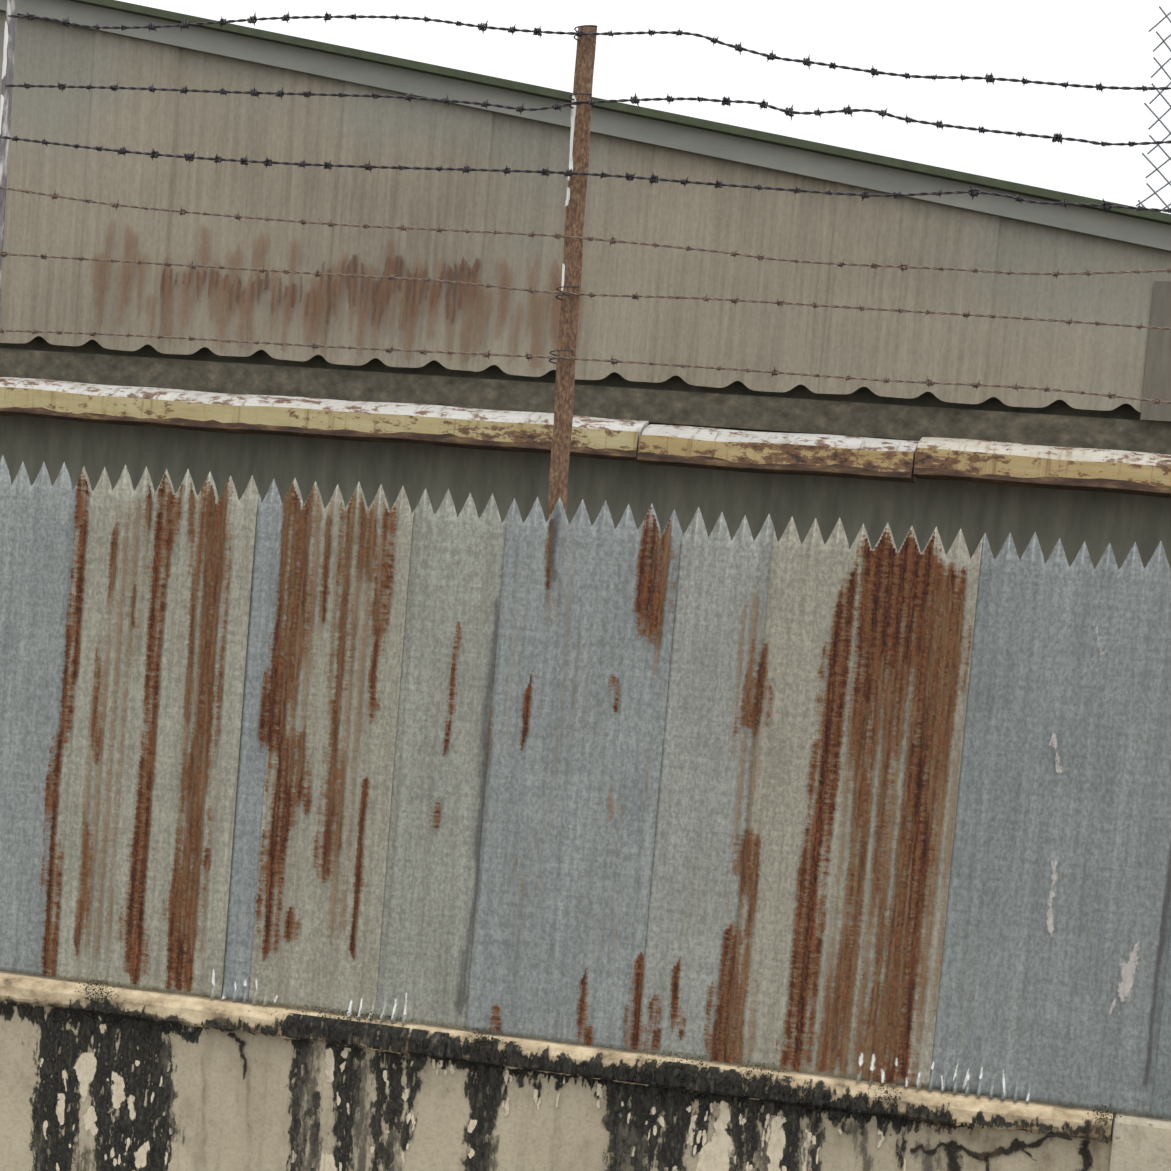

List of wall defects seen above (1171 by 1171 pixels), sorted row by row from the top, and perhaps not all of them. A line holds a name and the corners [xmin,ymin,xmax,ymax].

rust [632,507,675,674]
rust [39,470,90,977]
rust [74,474,233,992]
rust [255,483,397,962]
rust [703,589,773,1065]
rust [775,528,971,1086]
rust [489,1005,501,1033]
damp [0,995,1111,1171]
rust [576,968,596,1046]
rust [623,952,686,1050]
crack [910,1119,1093,1171]